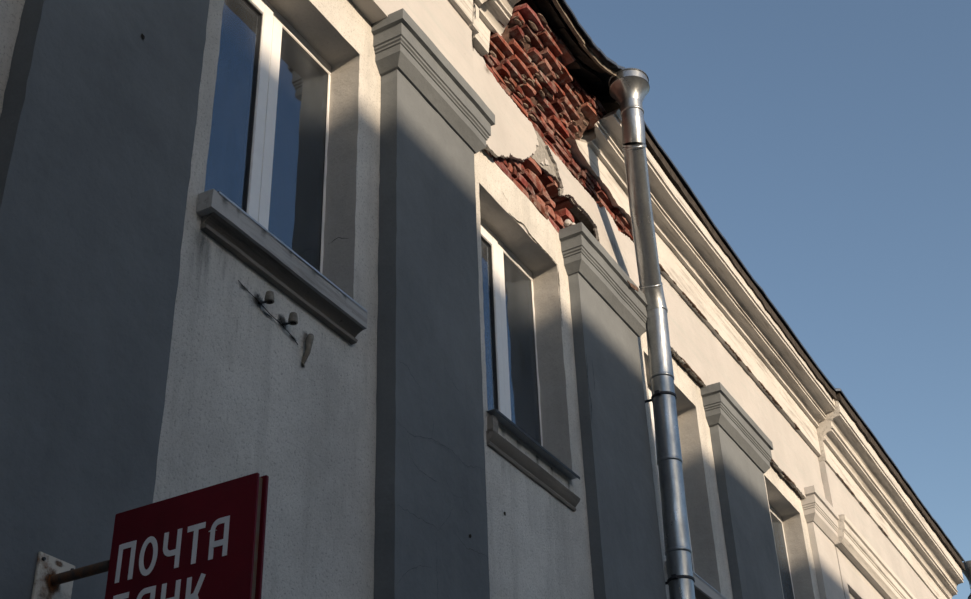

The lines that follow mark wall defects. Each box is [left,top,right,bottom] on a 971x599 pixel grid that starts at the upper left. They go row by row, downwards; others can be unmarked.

crack [472,0,489,57]
spalling [483,3,634,242]